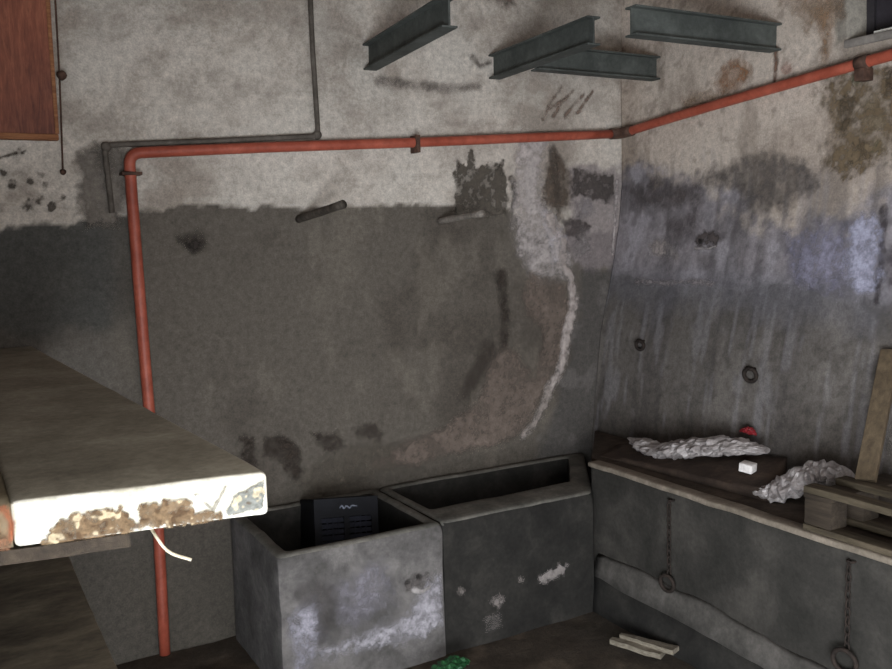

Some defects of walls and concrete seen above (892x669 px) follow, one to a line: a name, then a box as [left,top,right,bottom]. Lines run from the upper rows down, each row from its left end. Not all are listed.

peeling [453,149,518,218]
peeling [572,168,614,204]
peeling [563,218,590,240]
leakage [788,206,888,304]
flaking render [302,273,569,495]
corrosion [0,506,14,551]
spalling [40,482,265,545]
leakage [288,568,443,669]